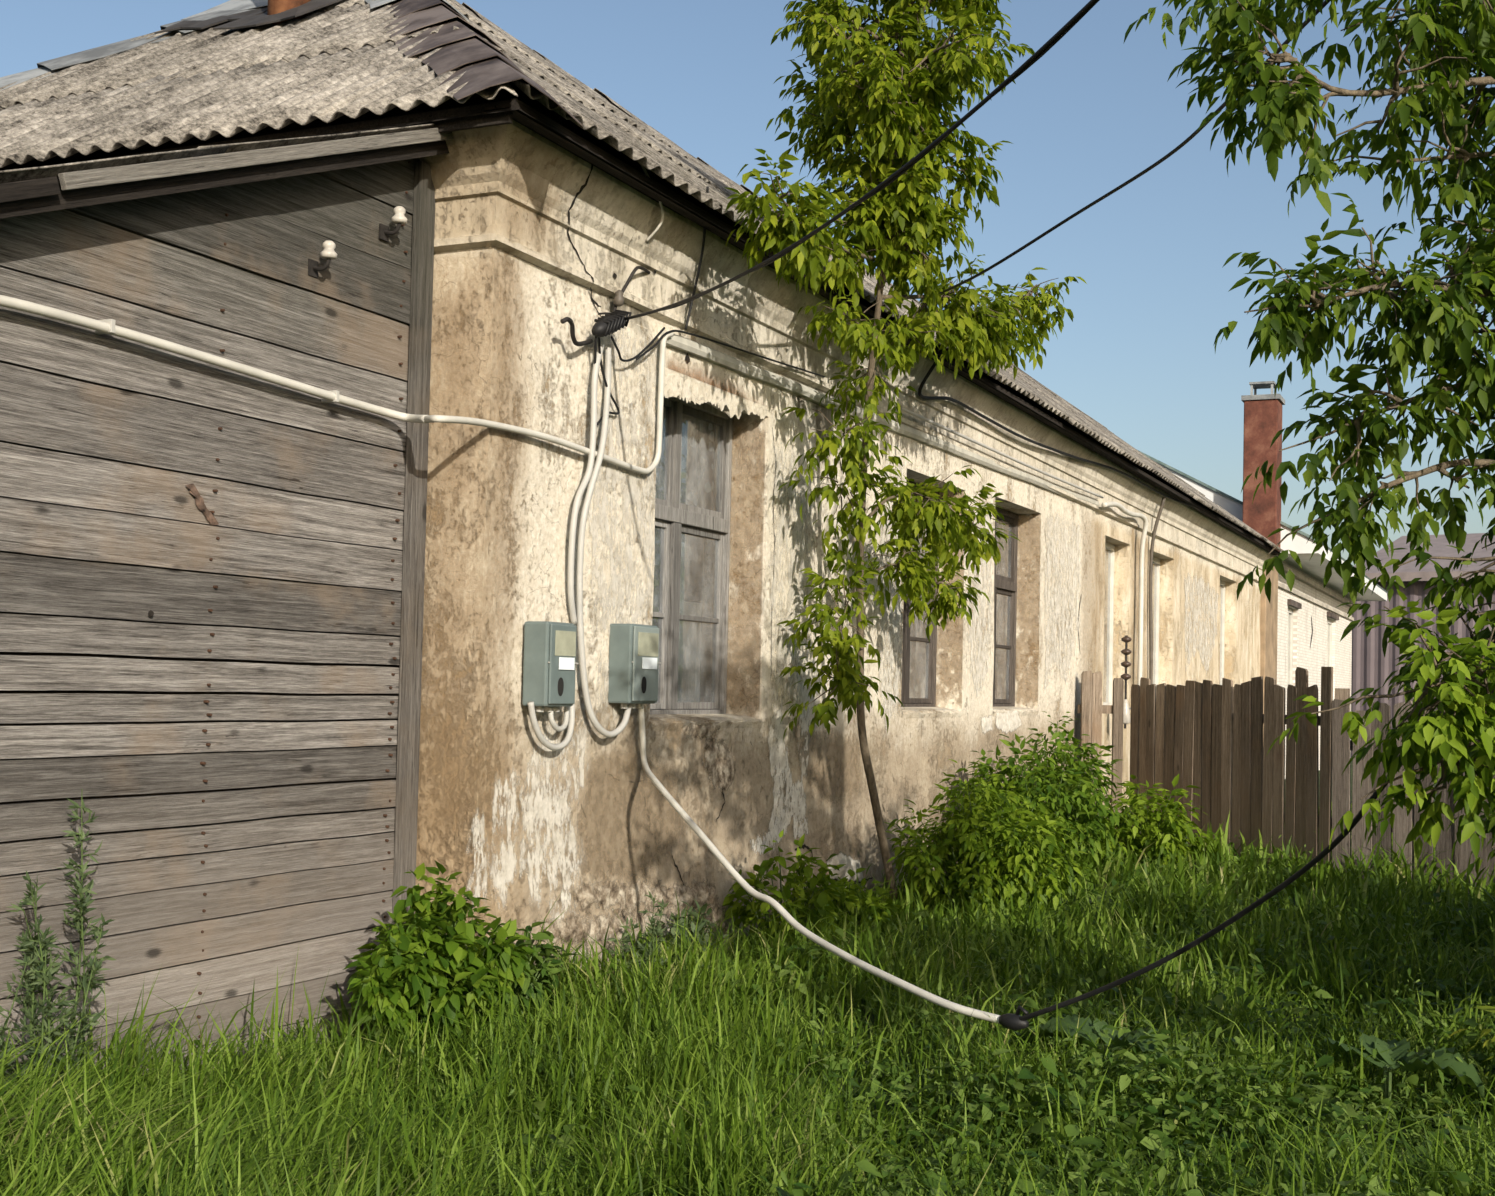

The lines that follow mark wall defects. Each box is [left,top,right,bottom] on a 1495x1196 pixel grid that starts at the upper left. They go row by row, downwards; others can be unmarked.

spalling [684,722,736,793]
peeling [738,419,860,855]